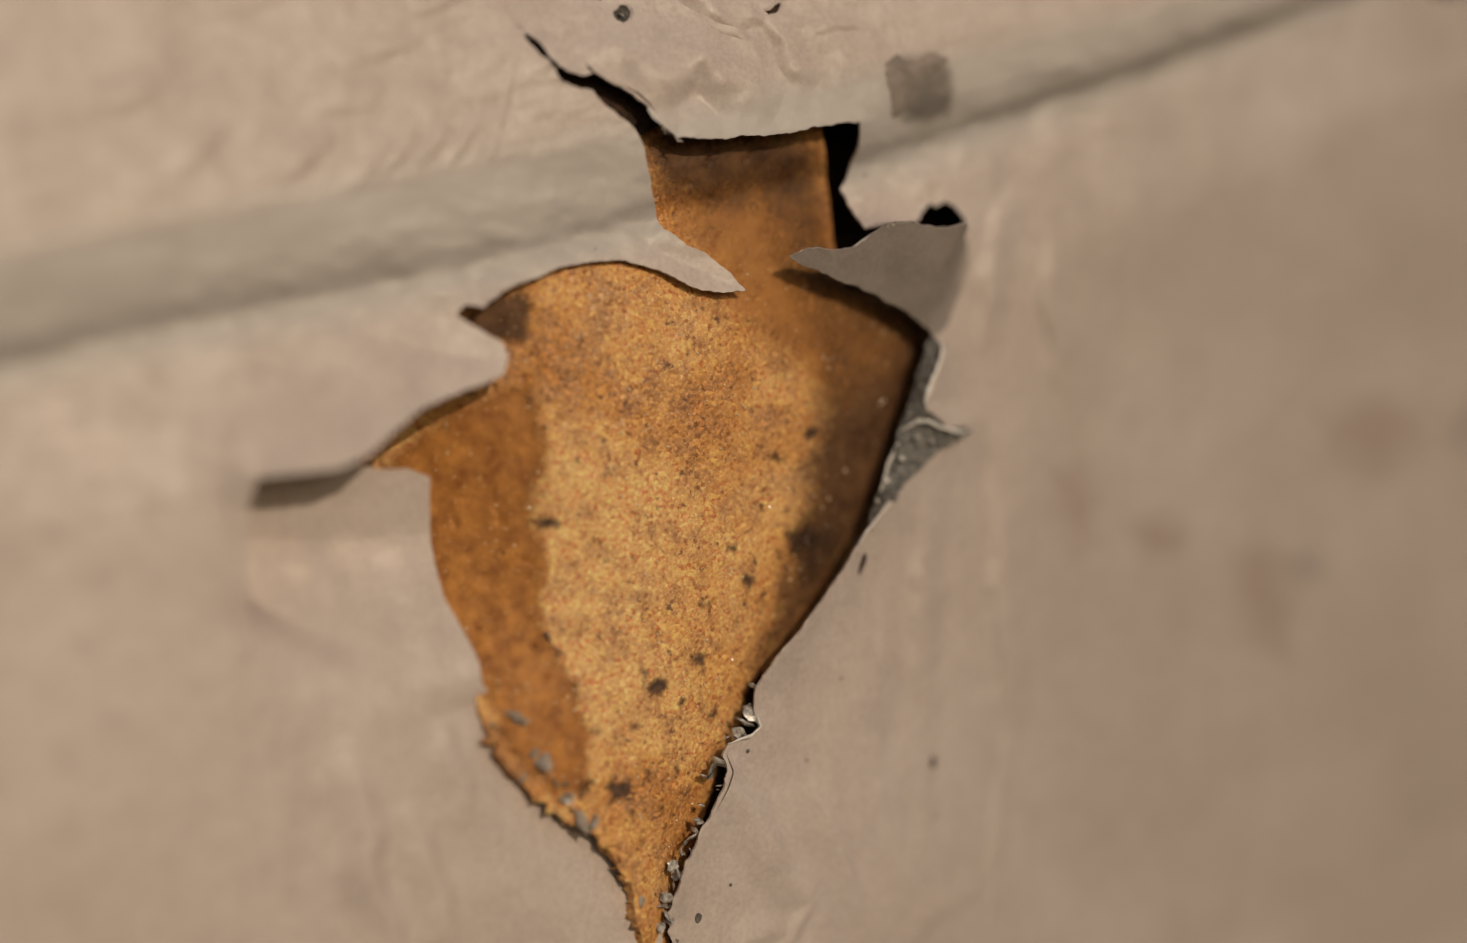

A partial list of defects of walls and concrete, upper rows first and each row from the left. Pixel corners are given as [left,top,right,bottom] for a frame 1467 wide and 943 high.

peeling [245,108,973,943]